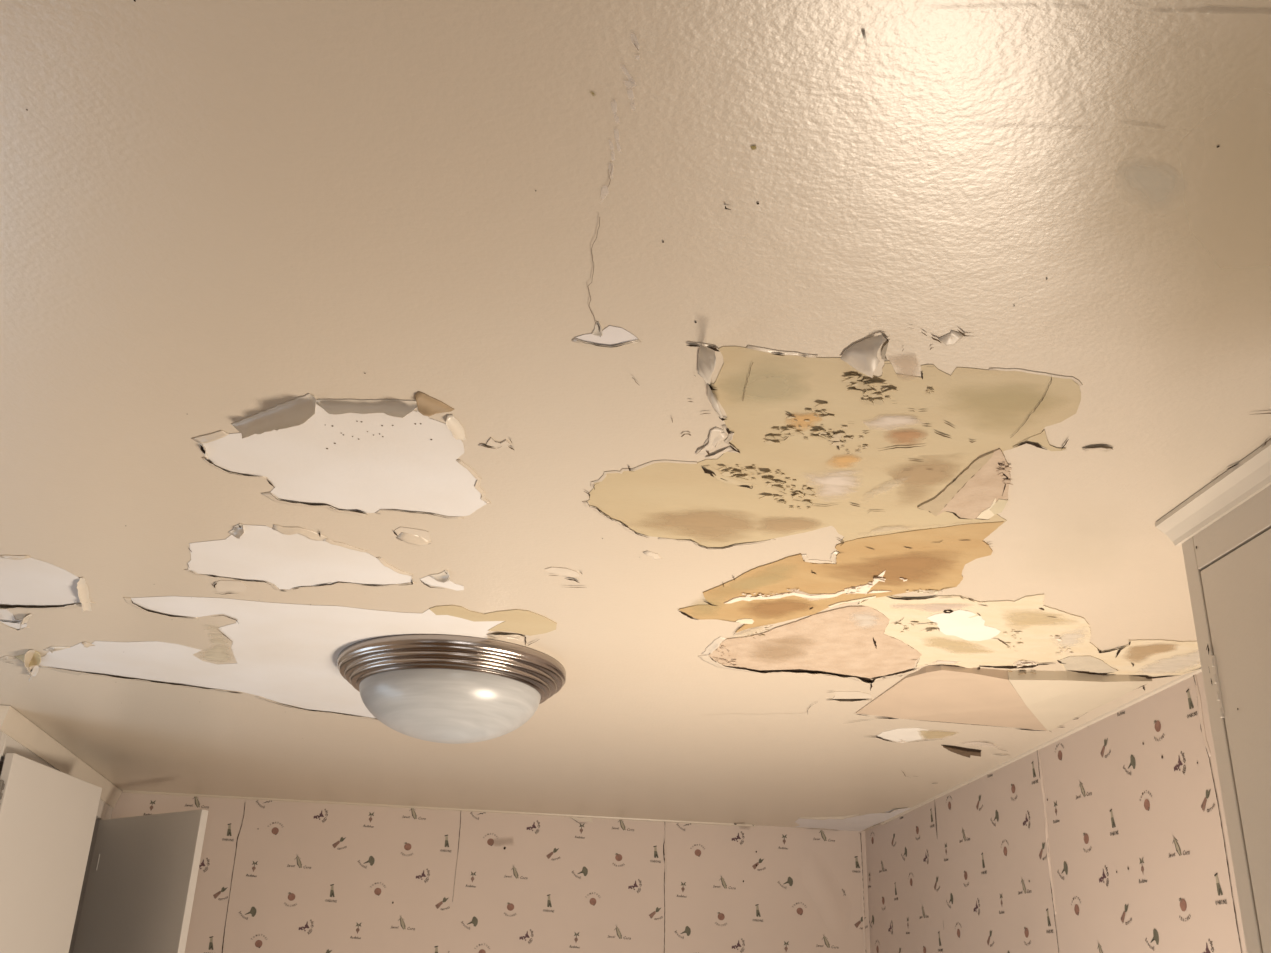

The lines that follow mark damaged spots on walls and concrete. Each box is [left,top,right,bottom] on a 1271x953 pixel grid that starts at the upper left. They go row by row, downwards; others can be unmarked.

crack [588,217,600,323]
peeling [571,322,642,349]
peeling [191,391,491,546]
peeling [582,335,1212,702]
peeling [0,523,557,720]
peeling [876,728,1009,758]